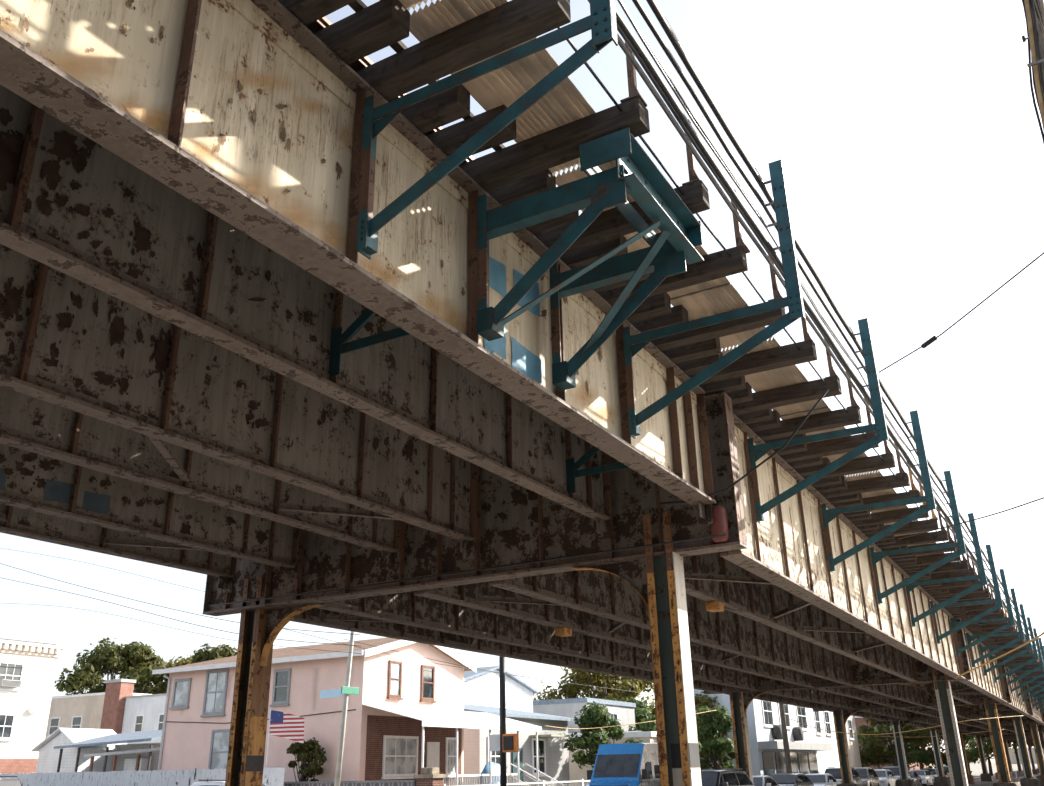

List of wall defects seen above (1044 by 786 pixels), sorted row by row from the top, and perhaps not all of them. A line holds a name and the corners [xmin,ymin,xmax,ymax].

peeling [228,79,265,108]
peeling [275,100,293,153]
peeling [36,180,116,261]
peeling [0,273,37,361]
peeling [50,291,114,358]
peeling [0,452,62,488]
peeling [368,433,417,458]